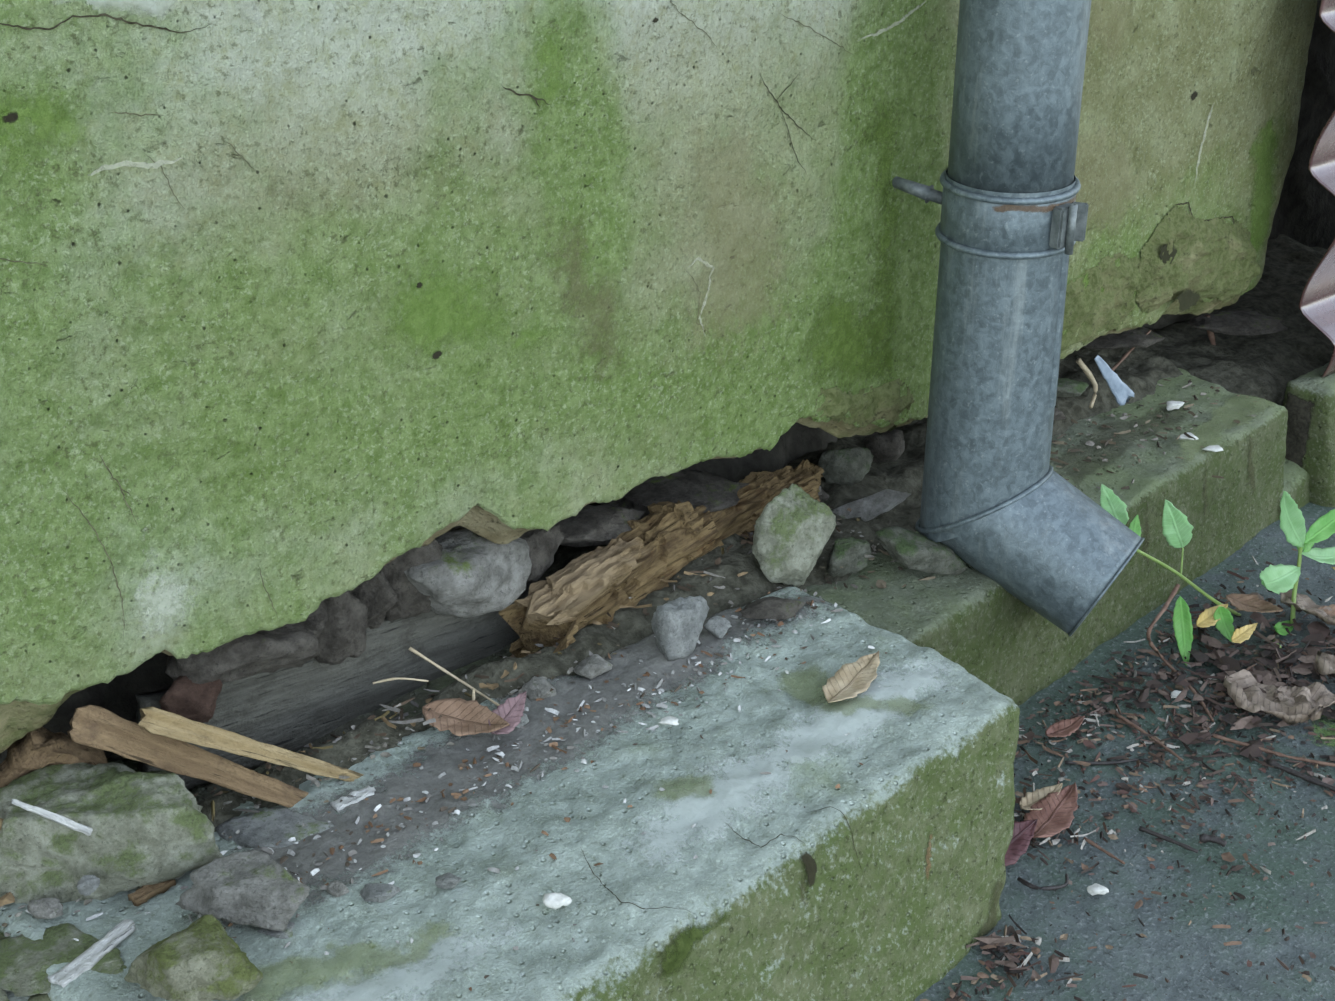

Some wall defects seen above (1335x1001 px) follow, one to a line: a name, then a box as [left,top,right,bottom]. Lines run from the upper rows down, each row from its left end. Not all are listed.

crack [0,13,216,33]
corrosion [994,196,1077,213]
crack [726,806,865,881]
crack [583,852,690,912]